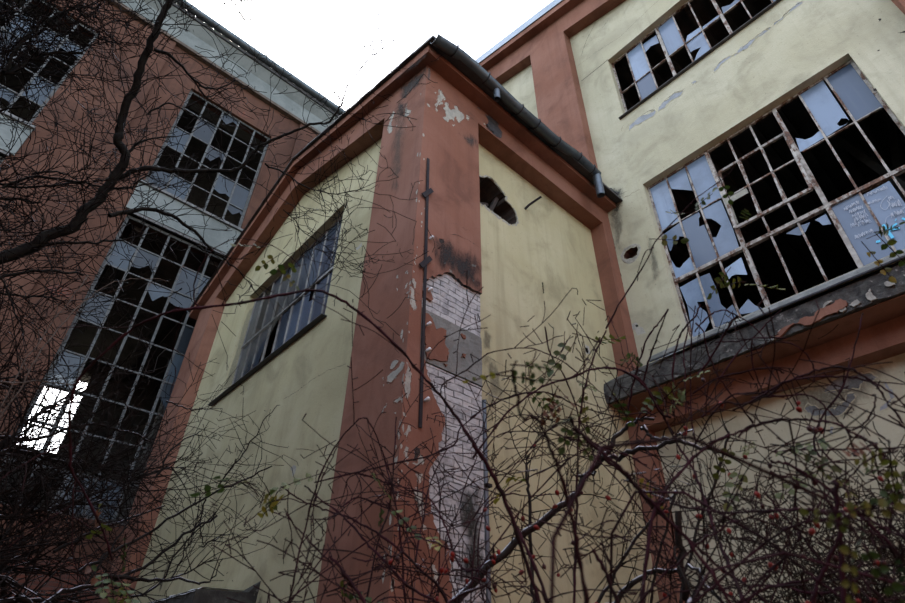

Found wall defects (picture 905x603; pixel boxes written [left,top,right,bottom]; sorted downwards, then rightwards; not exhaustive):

peeling [427,90,471,127]
spalling [479,175,519,227]
water stain [435,242,480,287]
spalling [621,244,641,264]
peeling [771,289,878,340]
spalling [381,246,486,603]